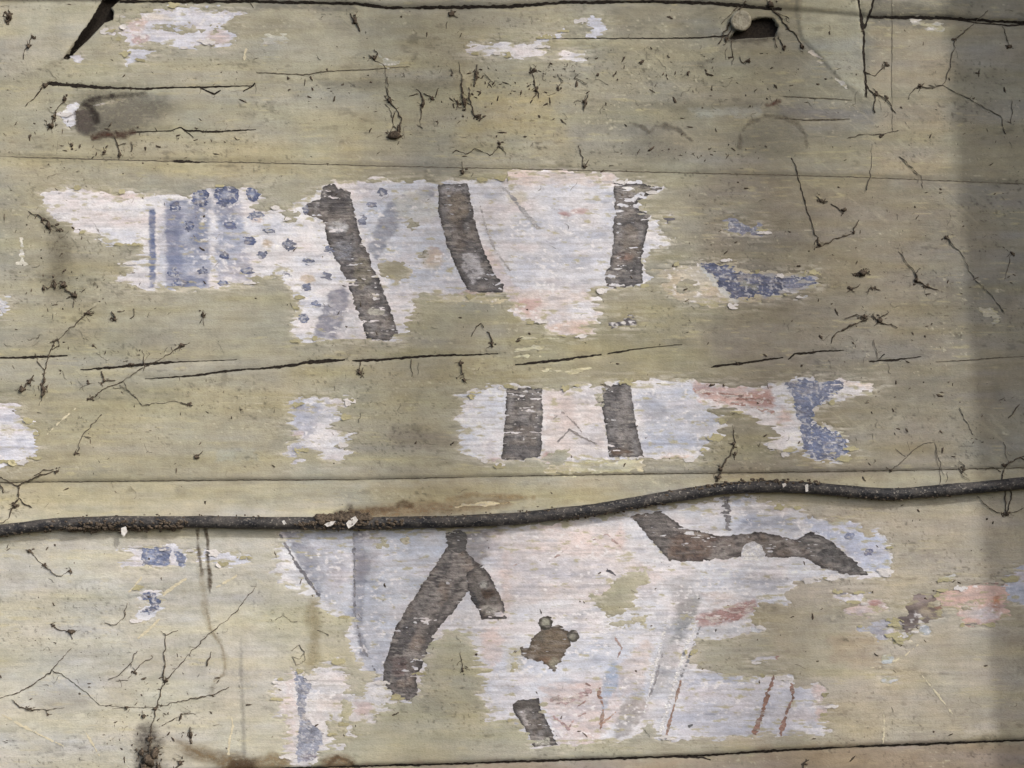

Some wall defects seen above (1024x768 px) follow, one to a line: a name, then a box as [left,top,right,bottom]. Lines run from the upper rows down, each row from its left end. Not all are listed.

peeling [100,2,247,67]
crack [48,0,410,95]
damp [75,93,164,140]
peeling [40,169,874,478]
crack [0,344,682,379]
crack [711,350,843,368]
crack [869,354,1024,362]
peeling [0,403,42,468]
peeling [267,493,1024,767]